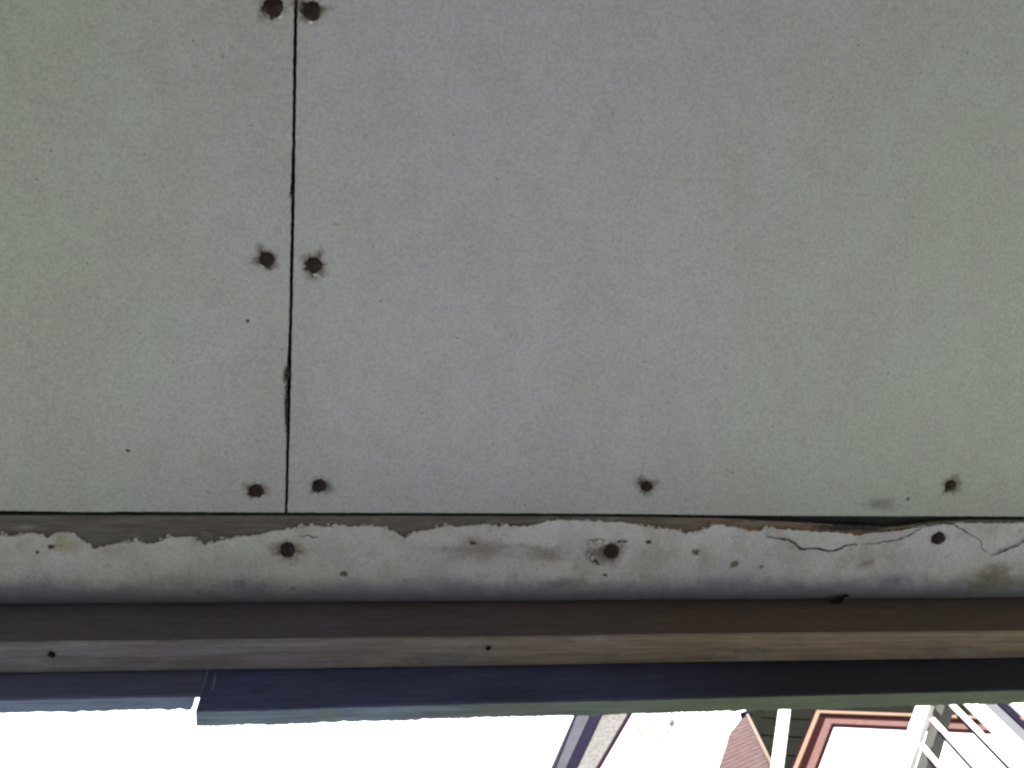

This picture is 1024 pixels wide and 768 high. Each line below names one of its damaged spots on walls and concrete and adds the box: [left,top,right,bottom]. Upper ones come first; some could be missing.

peeling [0,515,964,549]
crack [766,523,1024,556]